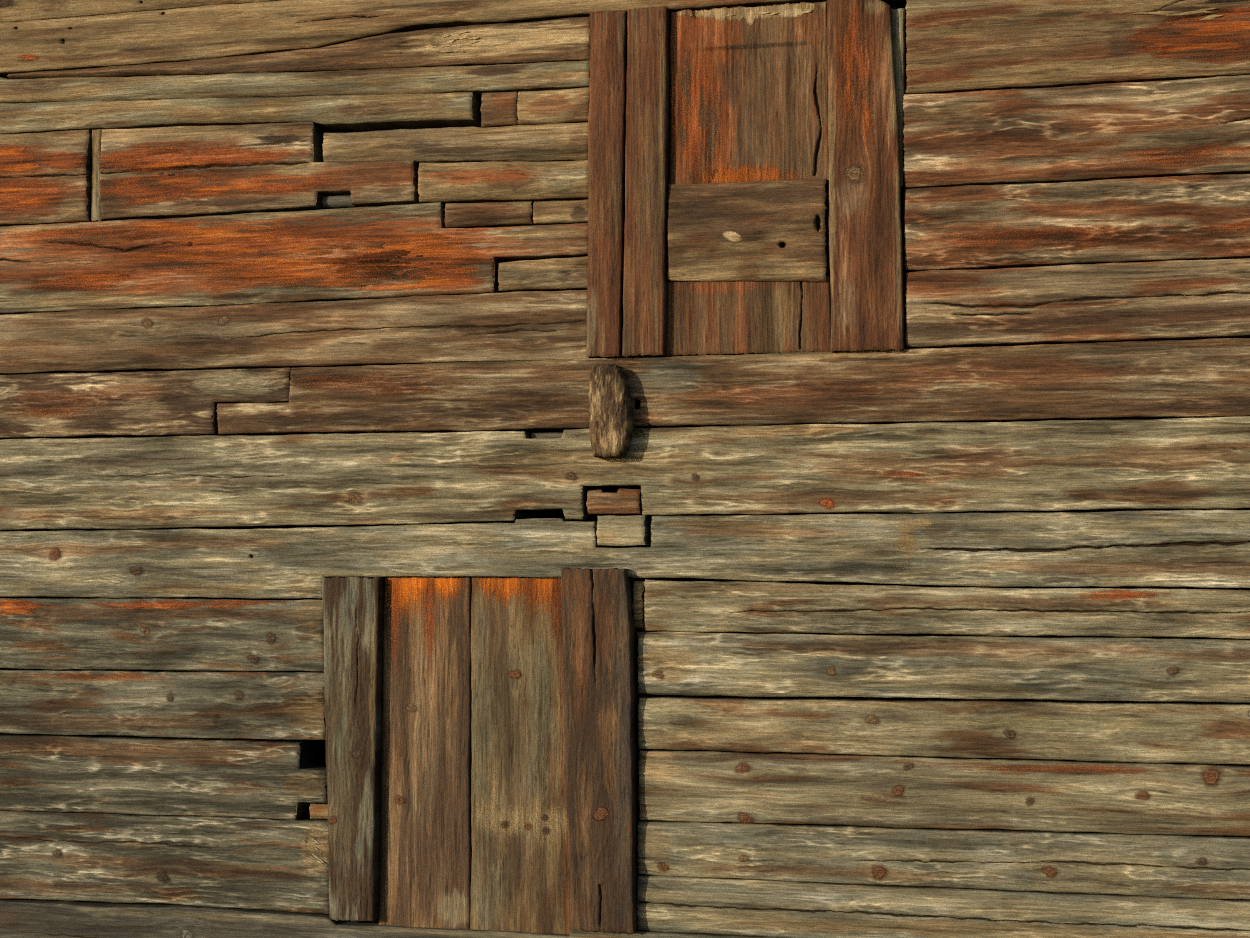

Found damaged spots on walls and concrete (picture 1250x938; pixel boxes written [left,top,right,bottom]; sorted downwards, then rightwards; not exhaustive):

rust [706,168,778,183]
crack [0,242,172,262]
rust [388,578,459,653]
rust [480,578,561,630]